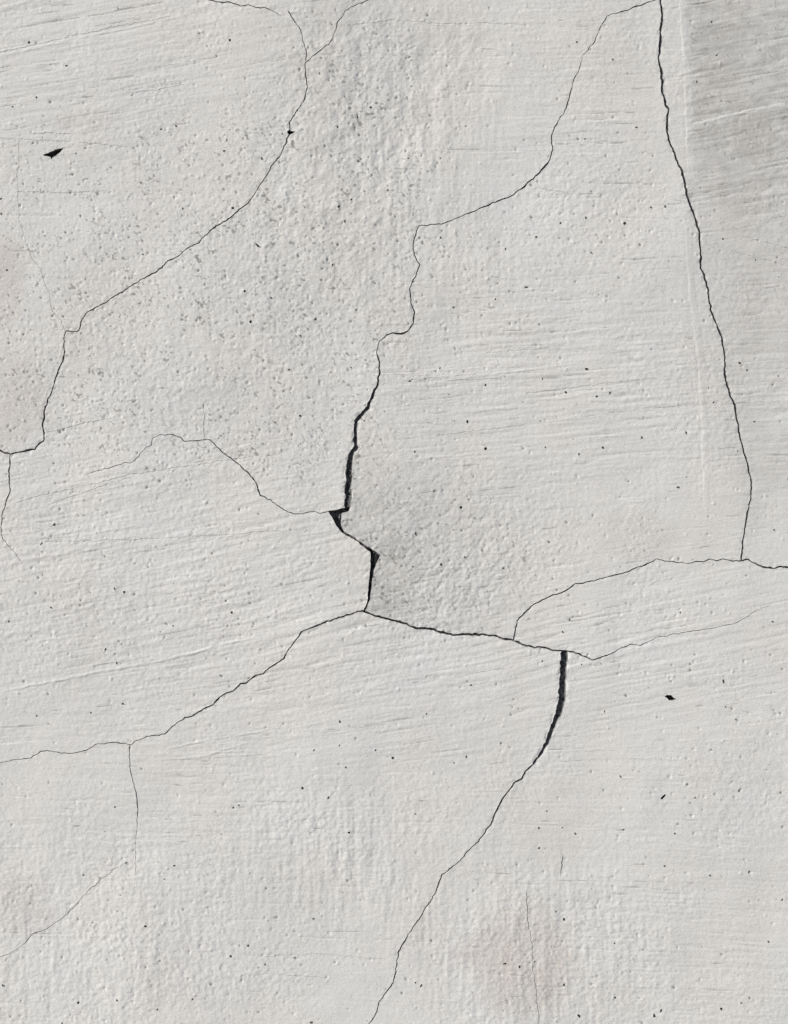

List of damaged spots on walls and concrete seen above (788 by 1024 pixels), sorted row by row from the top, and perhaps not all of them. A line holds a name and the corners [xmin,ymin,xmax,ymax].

crack [0,0,368,563]
crack [66,61,582,761]
crack [364,0,788,1024]
crack [0,851,136,957]